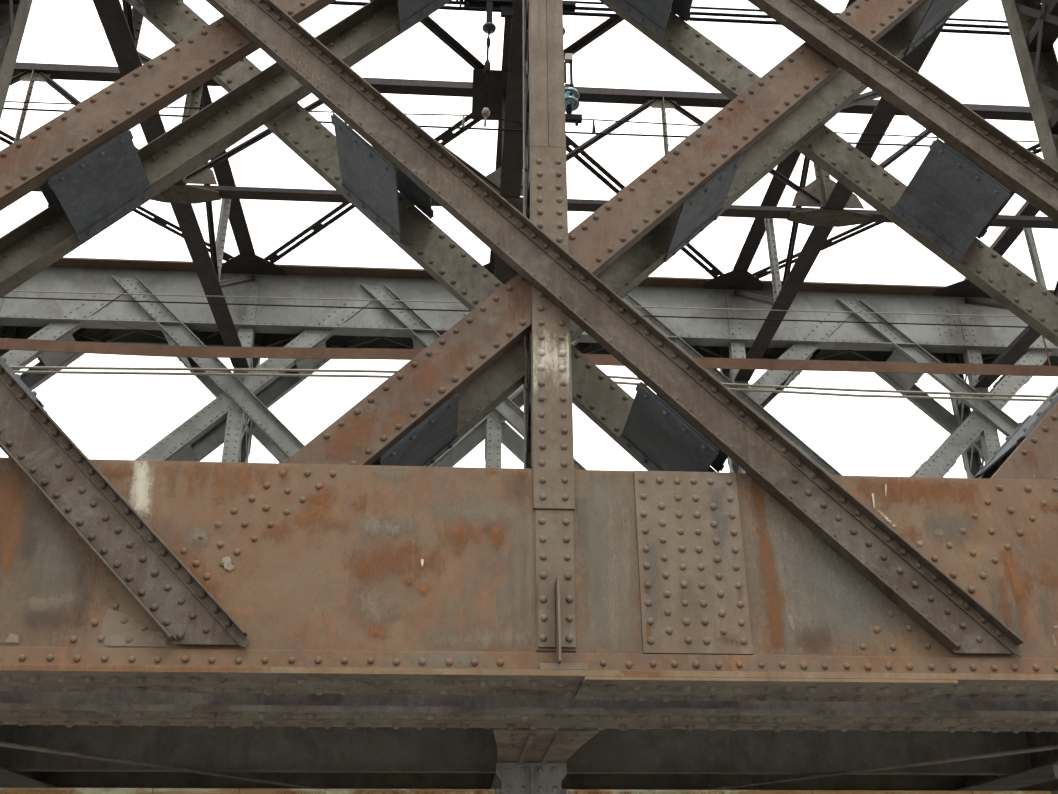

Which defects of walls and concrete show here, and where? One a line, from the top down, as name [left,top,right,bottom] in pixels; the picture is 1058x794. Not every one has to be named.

peeling [222,556,235,570]